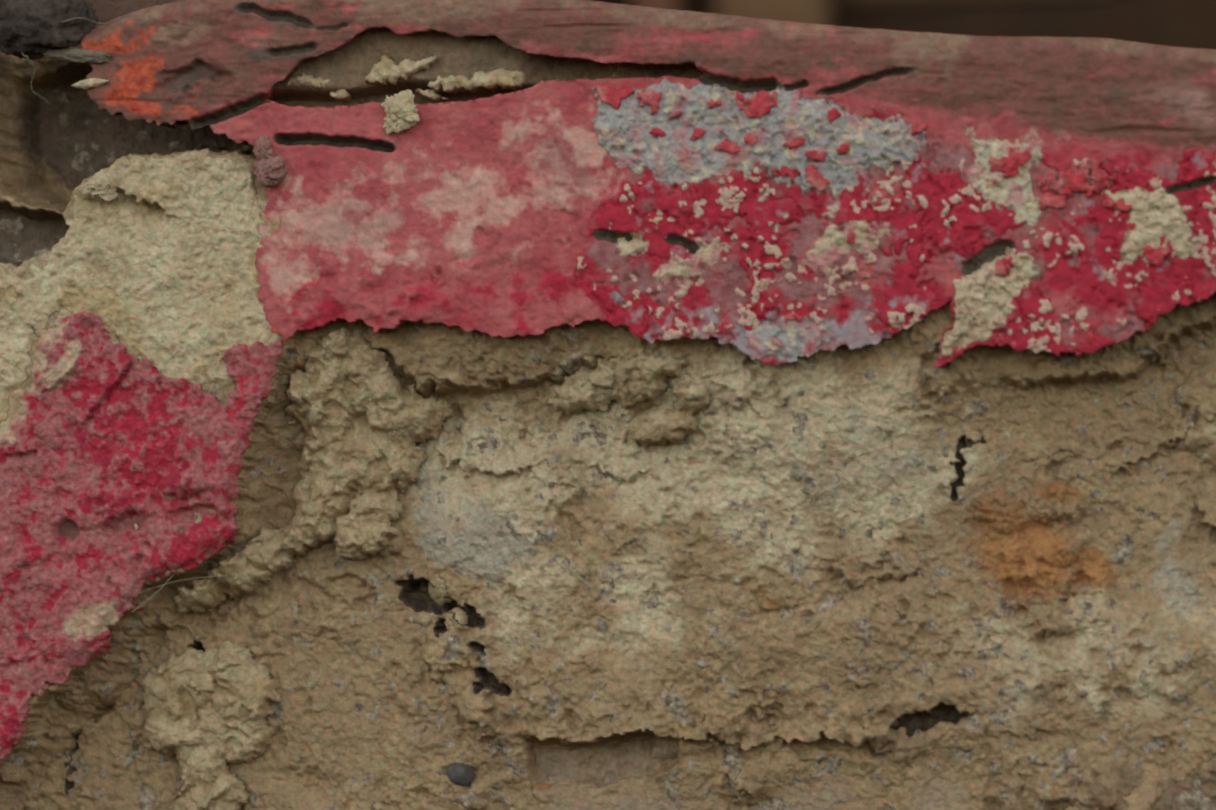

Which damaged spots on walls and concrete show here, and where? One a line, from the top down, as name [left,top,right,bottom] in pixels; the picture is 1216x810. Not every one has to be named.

crack [189,3,919,153]
peeling [592,78,928,197]
spalling [0,148,283,421]
peeling [614,232,649,256]
peeling [658,240,732,288]
peeling [744,313,831,360]
peeling [800,220,892,277]
peeling [941,246,1041,357]
peeling [962,128,1195,267]
crack [950,435,986,502]